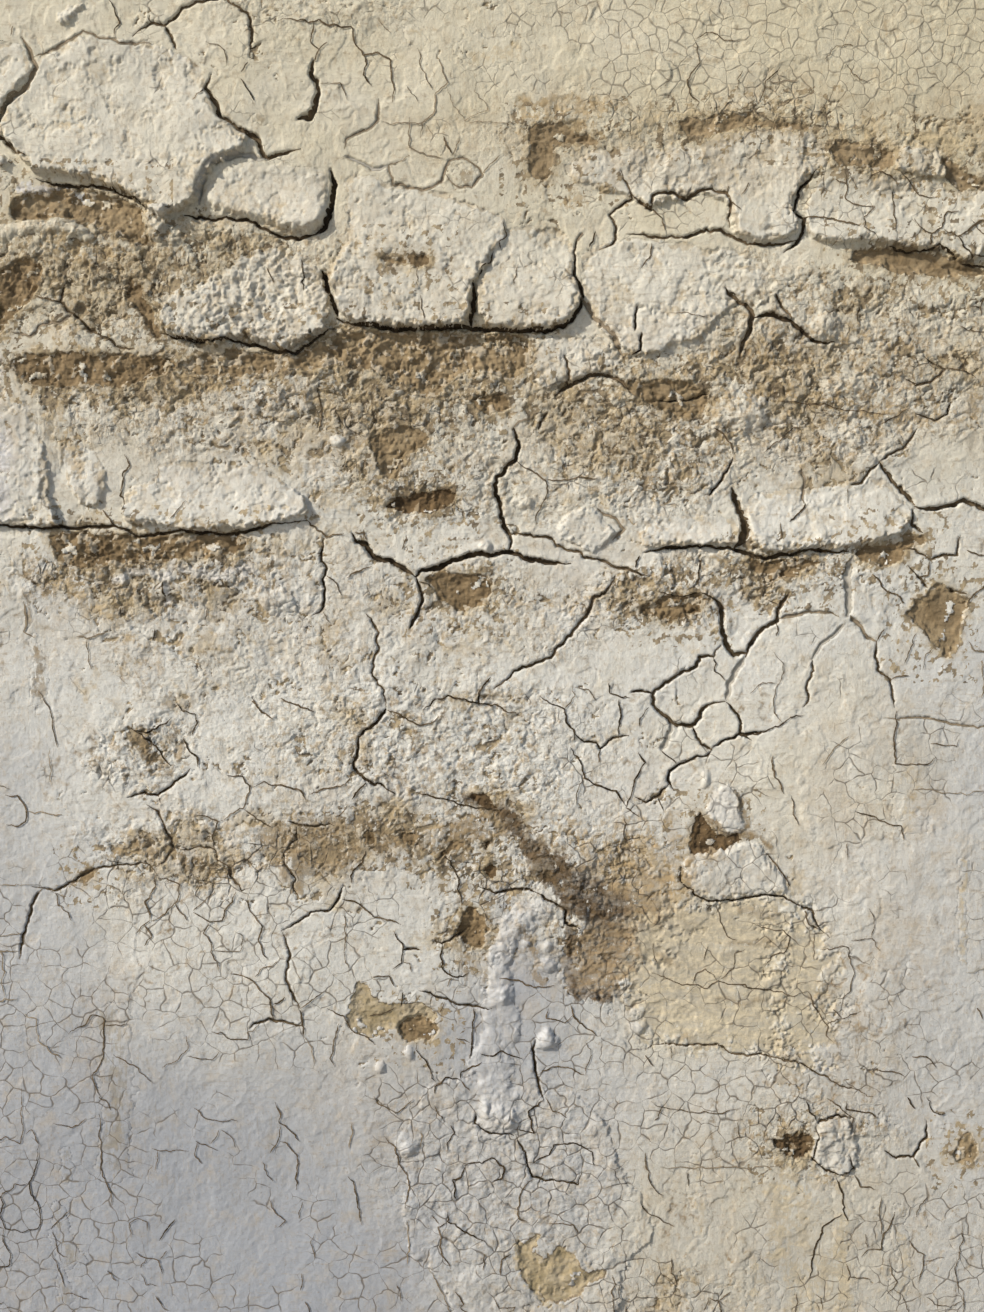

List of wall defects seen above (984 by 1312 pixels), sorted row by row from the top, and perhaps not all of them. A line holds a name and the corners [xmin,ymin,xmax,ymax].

crack [0,0,984,358]
peeling [0,2,984,419]
crack [906,298,984,386]
peeling [4,397,310,570]
peeling [639,478,926,583]
crack [0,355,984,1233]
peeling [614,784,859,1086]
crack [0,1088,89,1300]
crack [429,1157,511,1312]
peeling [395,1074,655,1312]
crack [645,1043,965,1312]
peeling [773,1119,859,1173]